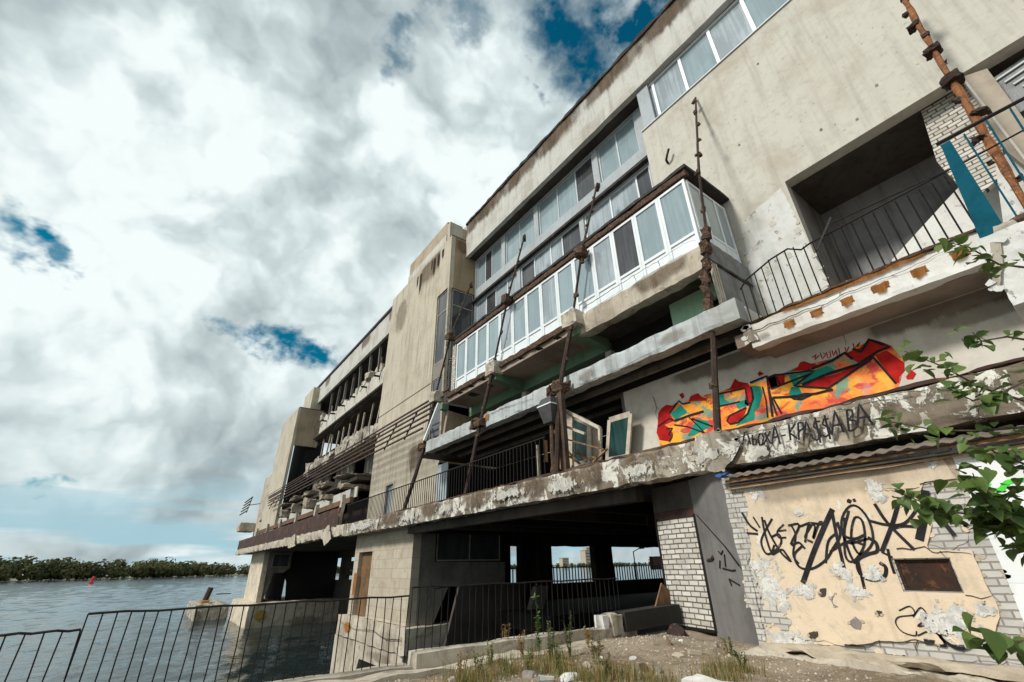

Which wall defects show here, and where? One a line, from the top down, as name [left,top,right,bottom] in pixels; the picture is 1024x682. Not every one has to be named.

leakage [458,0,690,253]
spalling [687,428,769,472]
peeling [615,460,665,480]
peeling [482,487,527,501]
peeling [547,477,585,495]
peeling [864,478,888,503]
spalling [922,452,969,550]
spalling [321,525,331,545]
peeling [347,519,378,533]
peeling [400,510,418,523]
peeling [731,481,886,644]
spalling [869,553,1024,664]